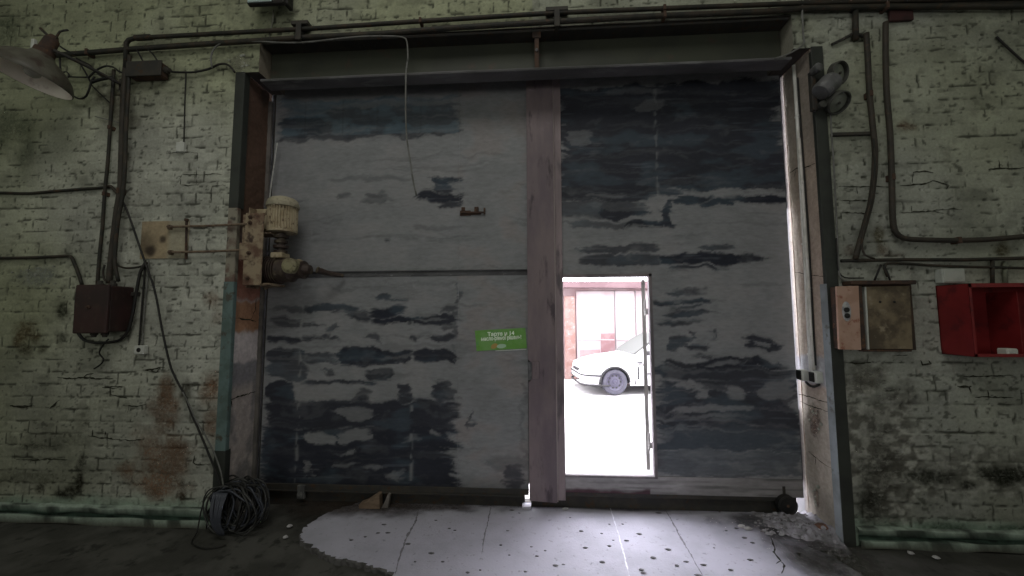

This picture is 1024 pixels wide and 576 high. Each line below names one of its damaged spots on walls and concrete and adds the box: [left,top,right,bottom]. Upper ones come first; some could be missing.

leakage [962,466,1024,488]